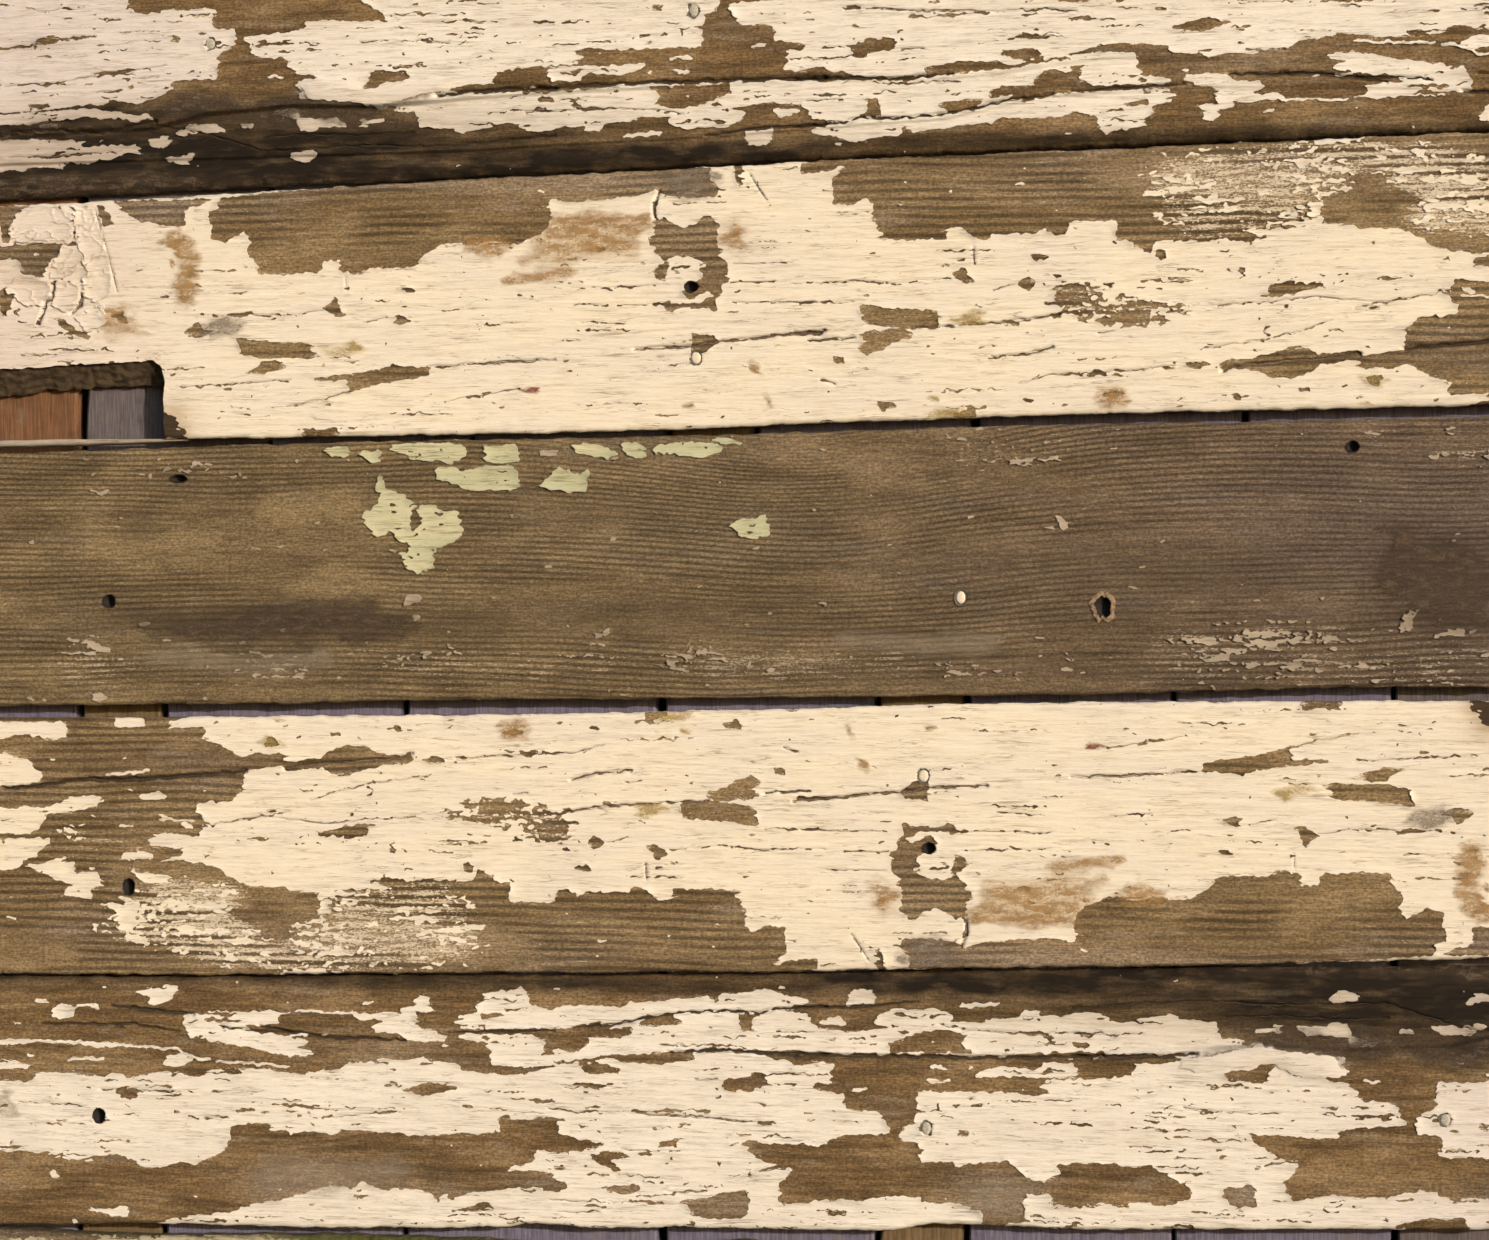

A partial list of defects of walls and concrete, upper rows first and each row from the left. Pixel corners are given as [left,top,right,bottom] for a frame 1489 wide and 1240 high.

peeling [0,0,1489,405]
crack [14,214,118,324]
peeling [163,413,187,439]
peeling [301,427,340,437]
peeling [952,405,987,419]
peeling [1299,701,1343,711]
peeling [1469,701,1489,726]
crack [213,754,426,826]
crack [460,745,709,842]
crack [645,769,1051,878]
crack [1072,736,1197,781]
peeling [0,717,1489,1230]